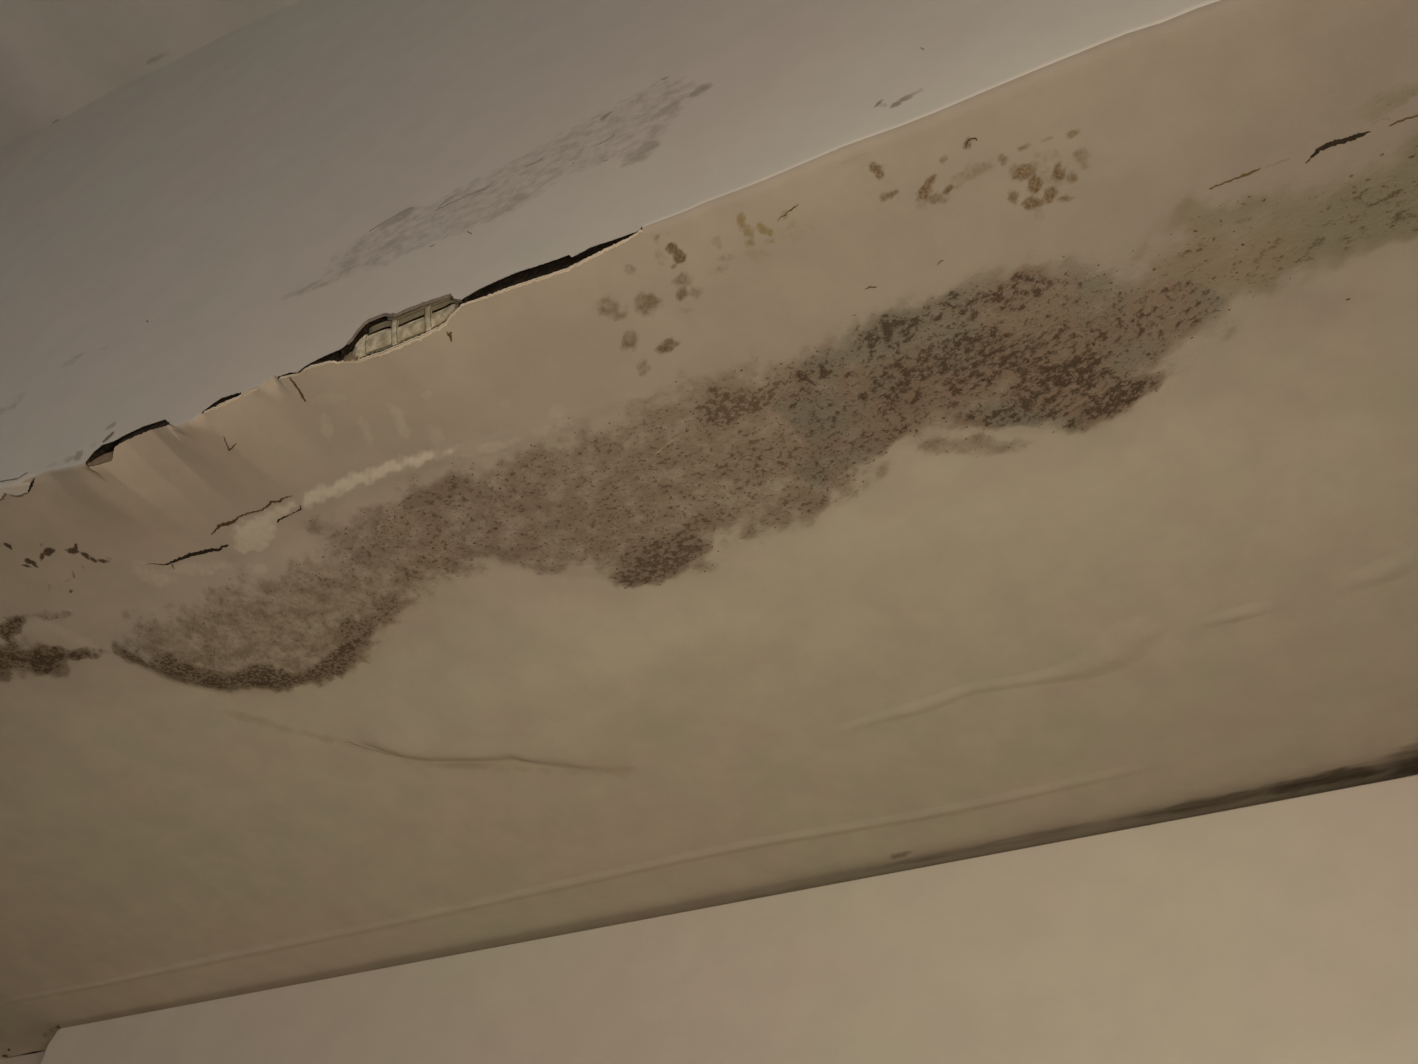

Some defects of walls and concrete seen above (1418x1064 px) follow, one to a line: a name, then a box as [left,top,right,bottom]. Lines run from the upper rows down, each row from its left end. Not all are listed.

crack [1209,114,1418,189]
flaking render [341,294,470,363]
damp [0,121,1418,700]
crack [151,496,302,569]